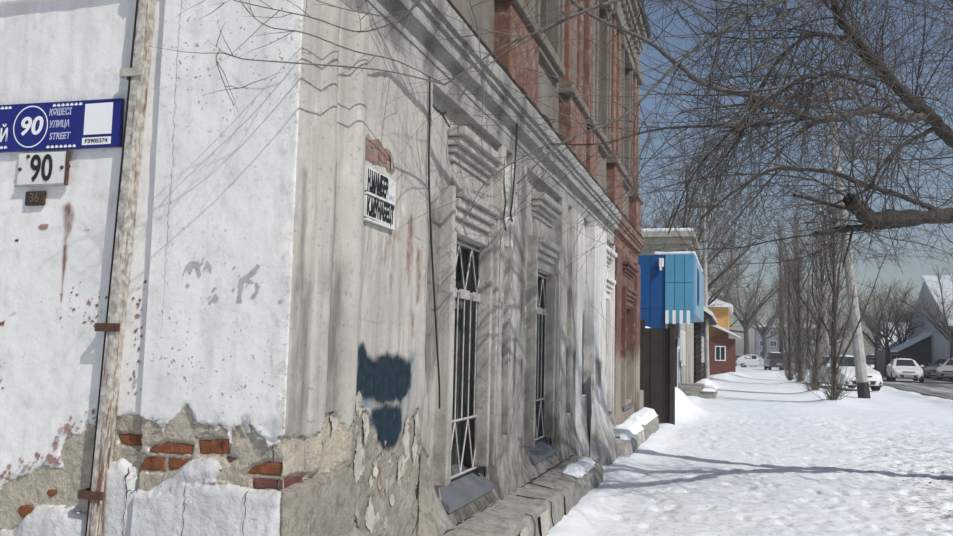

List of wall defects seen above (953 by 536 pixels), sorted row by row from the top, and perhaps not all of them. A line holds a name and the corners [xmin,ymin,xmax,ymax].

flaking render [365,133,395,175]
corrosion [61,204,71,300]
flaking render [0,409,96,530]
crack [122,467,136,536]
flaking render [112,391,443,536]